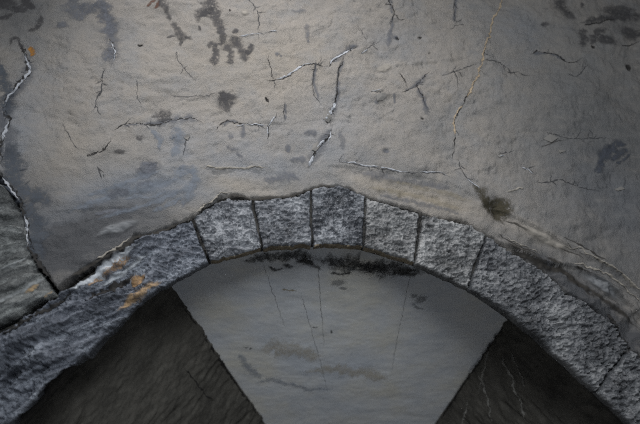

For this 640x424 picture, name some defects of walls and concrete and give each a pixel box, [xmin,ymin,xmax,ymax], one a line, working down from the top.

damp [159,0,191,45]
damp [196,0,253,64]
damp [580,6,640,44]
crack [0,41,34,159]
crack [217,104,286,137]
crack [268,29,378,166]
crack [339,0,527,187]
crack [63,117,197,178]
damp [473,185,511,221]
flaking render [73,225,176,275]
corrosion [121,275,158,308]
damp [246,250,420,290]